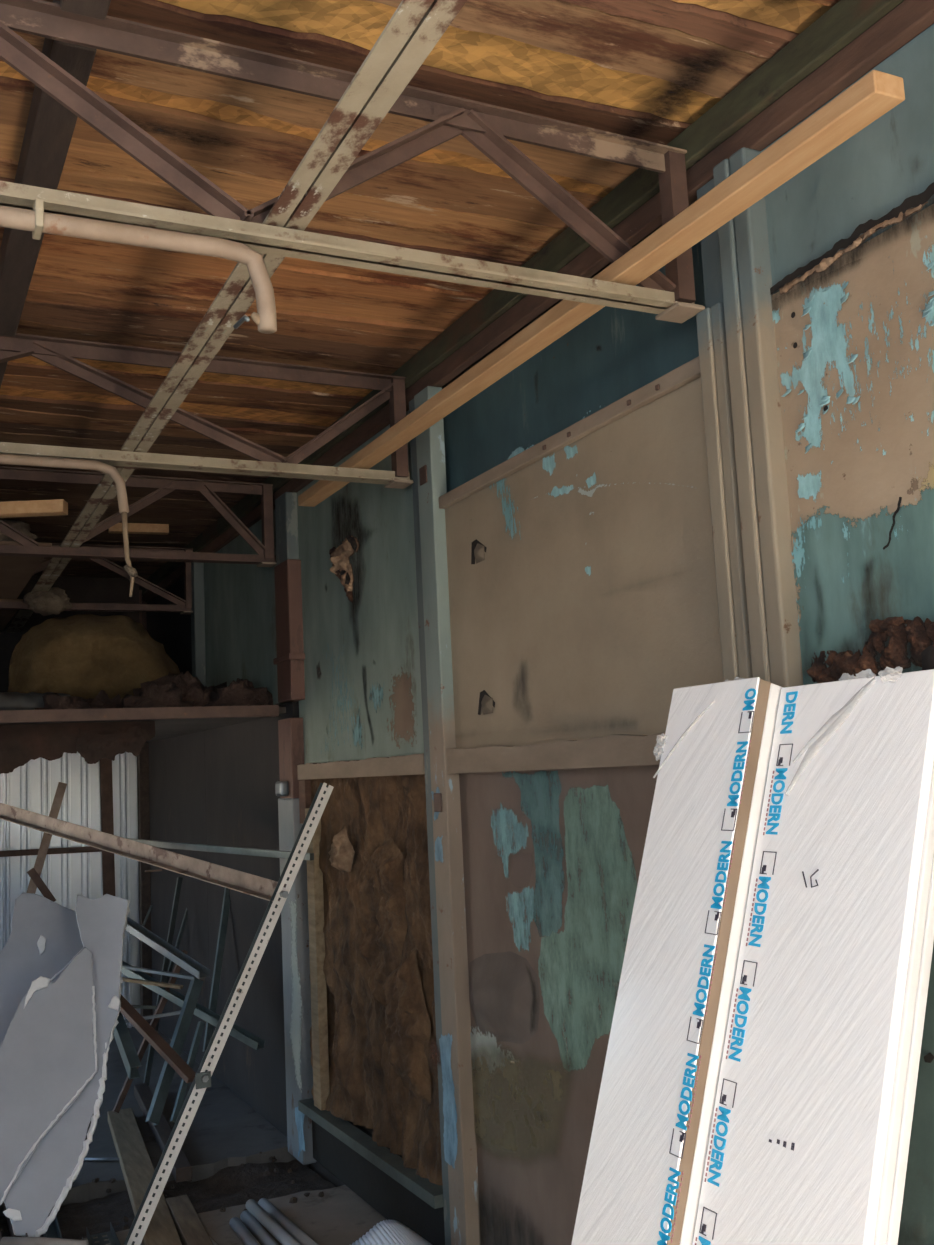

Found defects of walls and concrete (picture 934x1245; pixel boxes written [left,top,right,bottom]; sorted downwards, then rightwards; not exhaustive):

leakage [333,498,366,649]
peeling [779,244,934,685]
peeling [470,1026,519,1062]
peeling [491,770,637,1072]